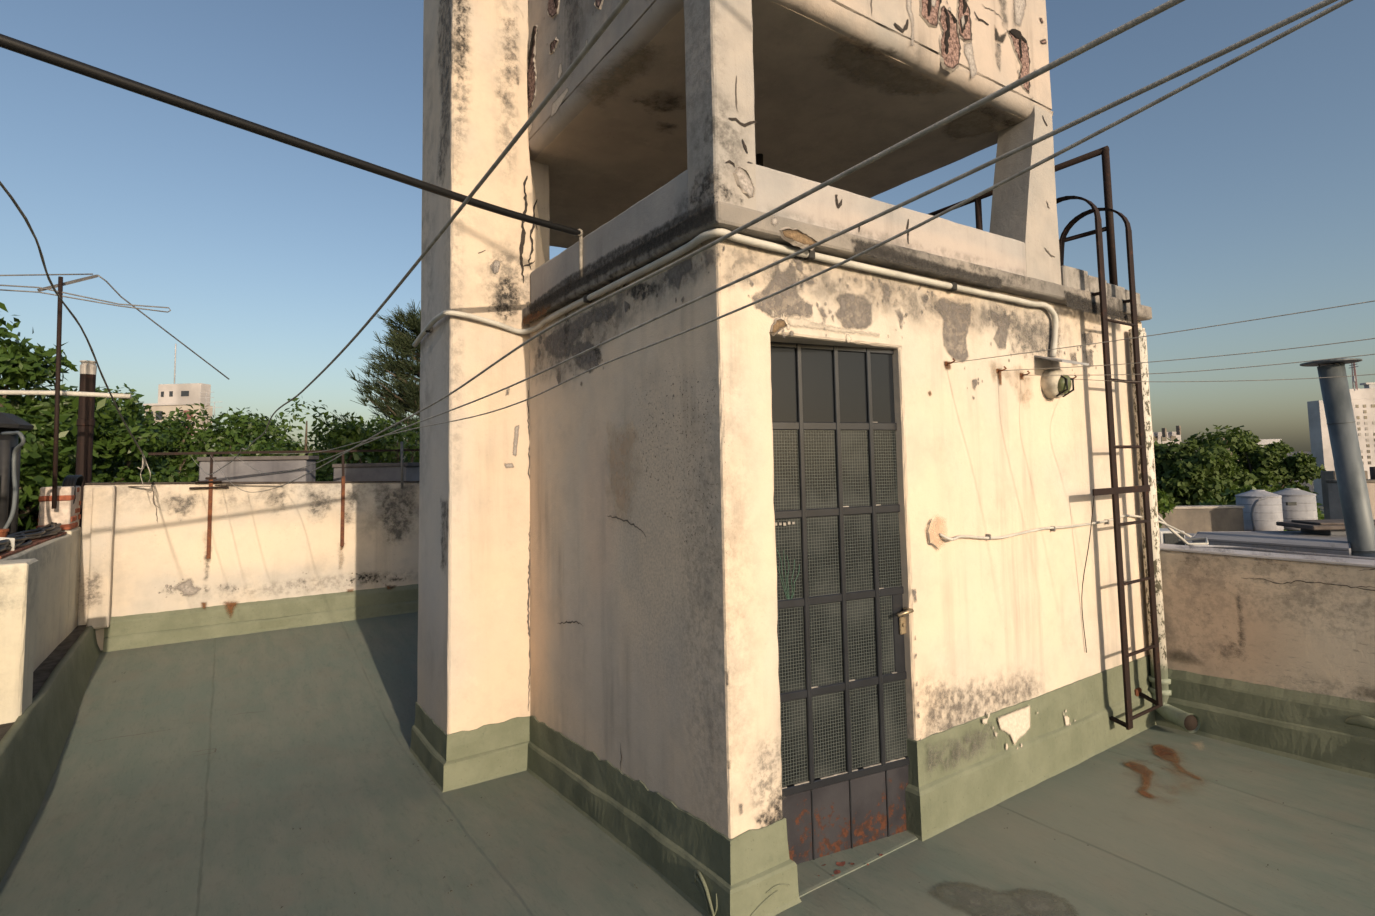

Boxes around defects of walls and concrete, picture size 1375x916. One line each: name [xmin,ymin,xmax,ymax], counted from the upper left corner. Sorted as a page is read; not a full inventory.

spalling [527,0,568,134]
spalling [894,0,977,78]
spalling [1006,0,1047,99]
damp [492,171,742,320]
damp [378,492,412,539]
damp [931,683,1031,728]
peeling [983,706,1038,750]
corrosion [1125,744,1200,798]
damp [934,883,1076,916]